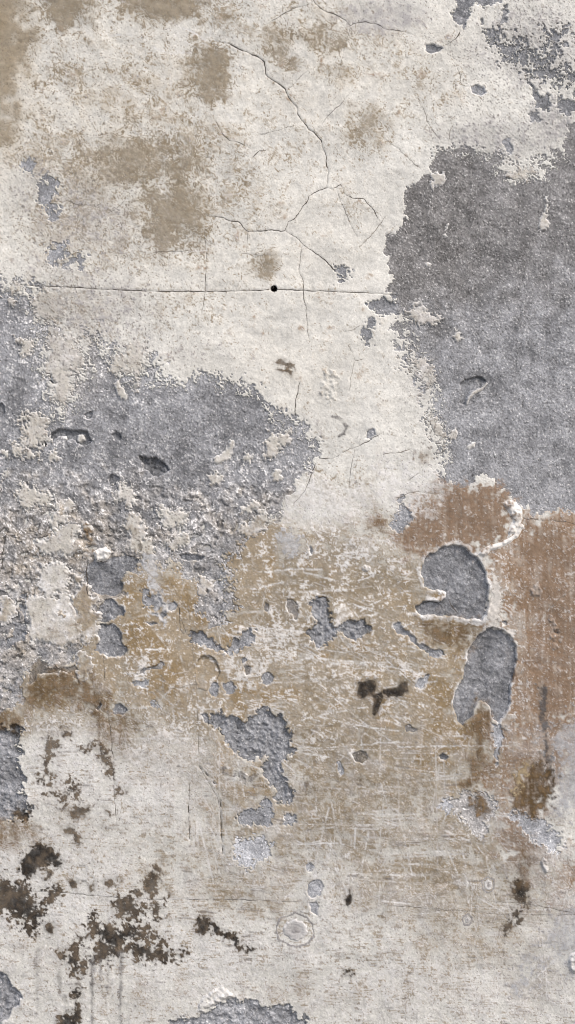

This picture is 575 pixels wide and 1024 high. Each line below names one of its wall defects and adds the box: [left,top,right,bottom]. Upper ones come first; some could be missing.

water stain [0,0,32,147]
crack [30,0,413,336]
spalling [360,0,575,518]
spalling [0,274,324,823]
spalling [286,596,372,649]
water stain [357,680,408,715]
spalling [415,545,516,766]
water stain [483,568,518,648]
spalling [201,706,297,873]
water stain [0,842,190,1024]
water stain [195,916,255,953]
spalling [168,997,309,1024]